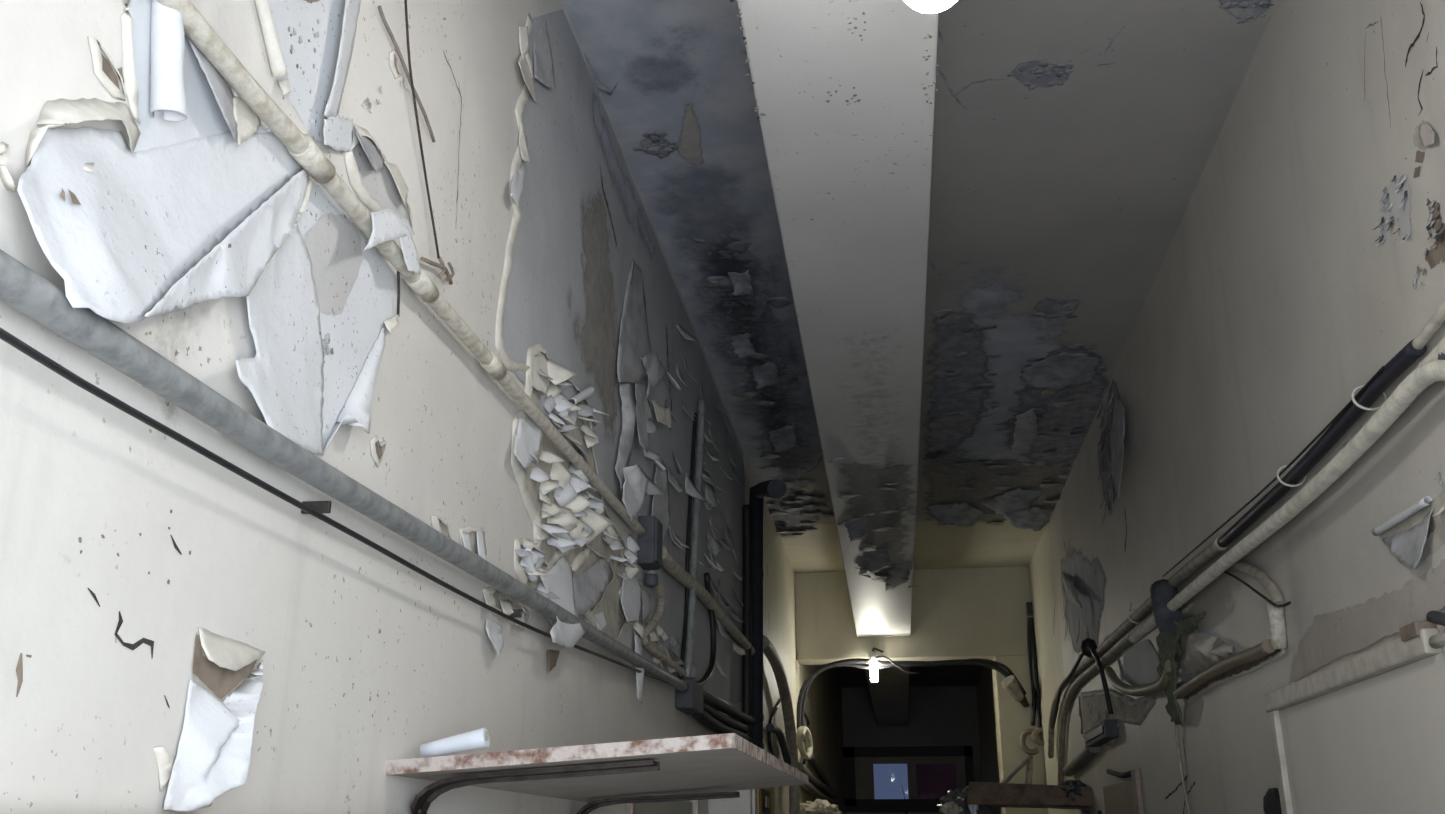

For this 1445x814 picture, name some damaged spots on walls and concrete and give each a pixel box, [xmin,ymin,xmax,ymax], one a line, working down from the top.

peeling [0,0,421,468]